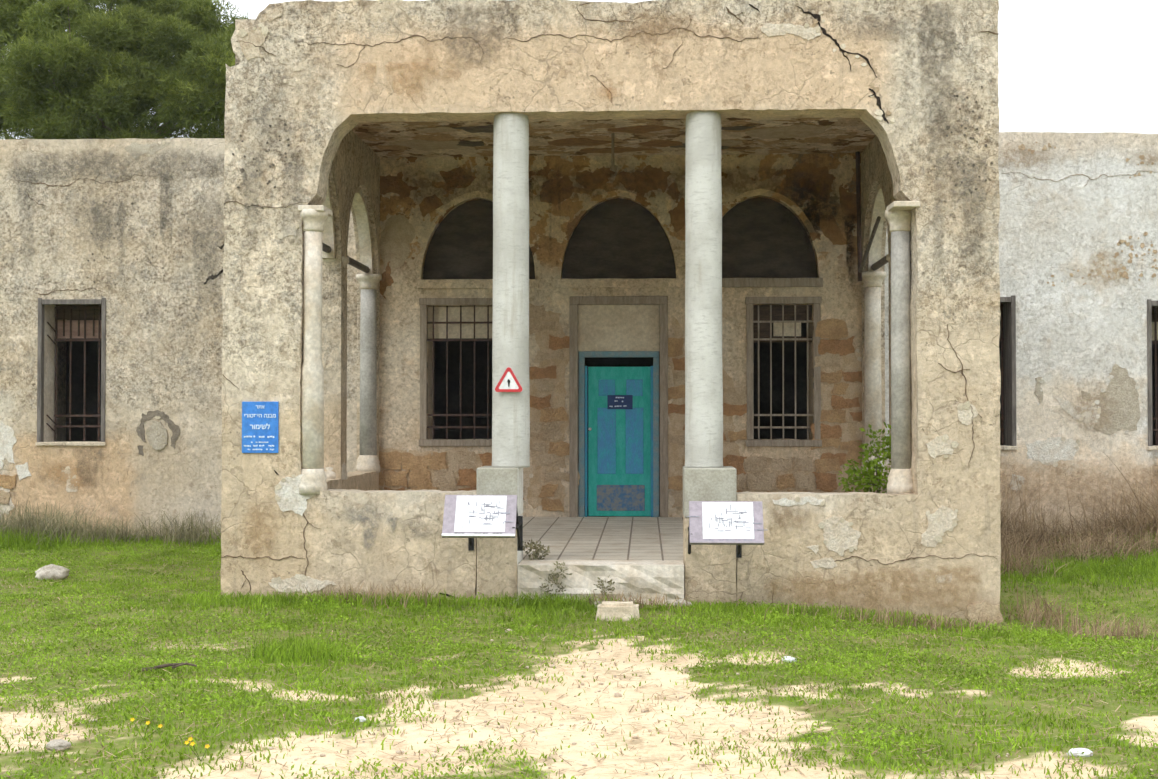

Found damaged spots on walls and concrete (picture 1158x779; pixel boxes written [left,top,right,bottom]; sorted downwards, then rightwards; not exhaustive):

crack [302,3,760,68]
crack [798,6,895,123]
peeling [452,124,493,147]
peeling [540,125,685,206]
peeling [668,197,685,233]
crack [1001,170,1153,186]
peeling [0,417,31,519]
peeling [274,474,315,516]
peeling [668,317,685,508]
peeling [722,316,862,569]
crack [939,324,983,462]
peeling [1034,364,1141,436]